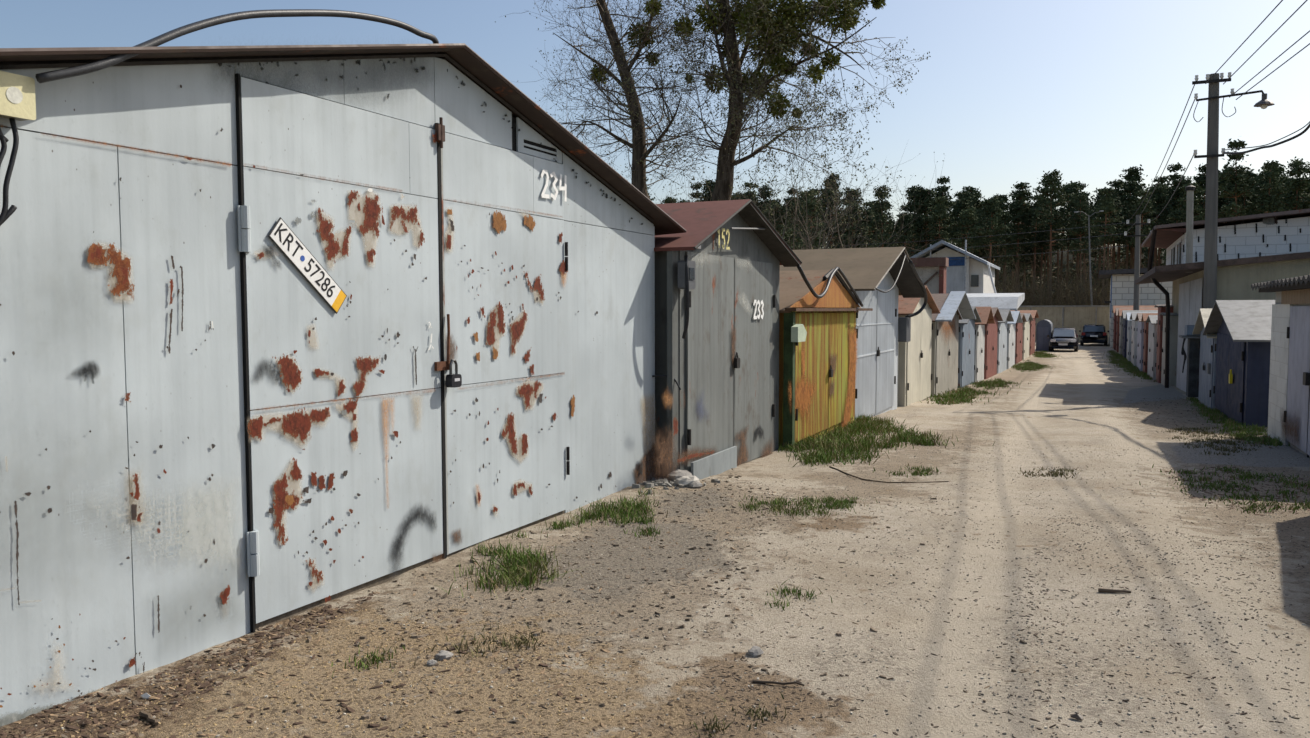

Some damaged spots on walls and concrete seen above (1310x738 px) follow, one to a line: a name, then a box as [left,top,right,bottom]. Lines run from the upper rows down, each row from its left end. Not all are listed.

rust [85,232,135,300]
rust [316,187,425,266]
rust [489,210,507,234]
rust [524,211,554,232]
rust [248,353,385,443]
rust [467,272,575,455]
rust [634,417,716,484]
rust [269,458,348,551]